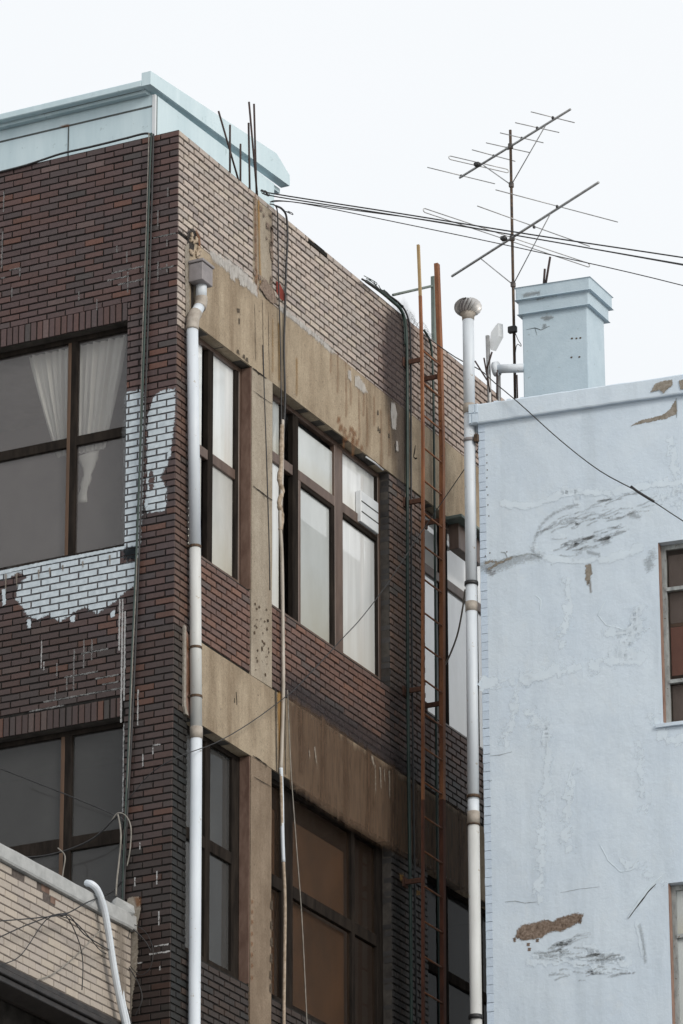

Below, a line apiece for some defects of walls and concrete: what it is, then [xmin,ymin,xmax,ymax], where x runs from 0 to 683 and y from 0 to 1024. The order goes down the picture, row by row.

flaking render [632,379,683,426]
peeling [0,389,175,628]
water stain [288,699,469,895]
flaking render [513,912,584,951]